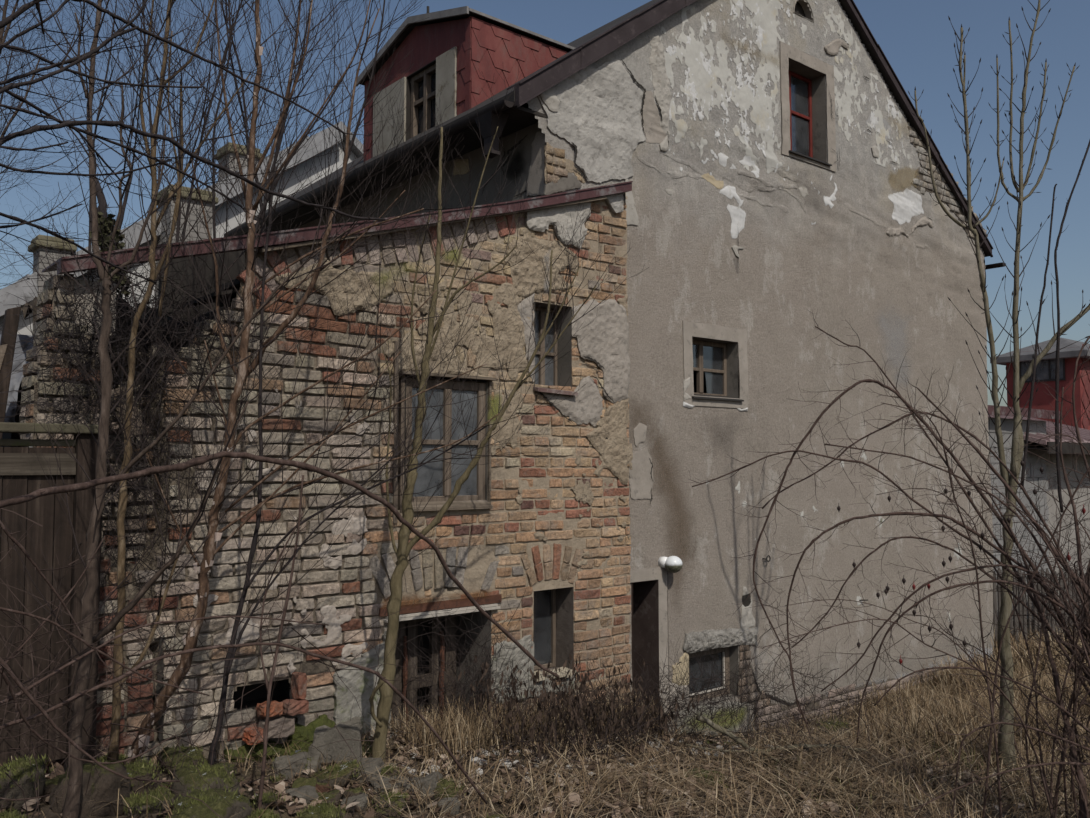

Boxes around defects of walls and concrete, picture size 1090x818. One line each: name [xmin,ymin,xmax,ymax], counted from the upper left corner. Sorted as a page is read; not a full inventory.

crack [621,59,669,145]
peeling [537,0,837,258]
peeling [814,0,988,246]
crack [571,142,589,181]
peeling [525,202,591,249]
peeling [517,293,630,425]
peeling [350,415,371,435]
peeling [491,389,529,455]
peeling [319,515,368,569]
peeling [193,594,219,607]
peeling [221,618,260,648]
peeling [332,642,368,666]